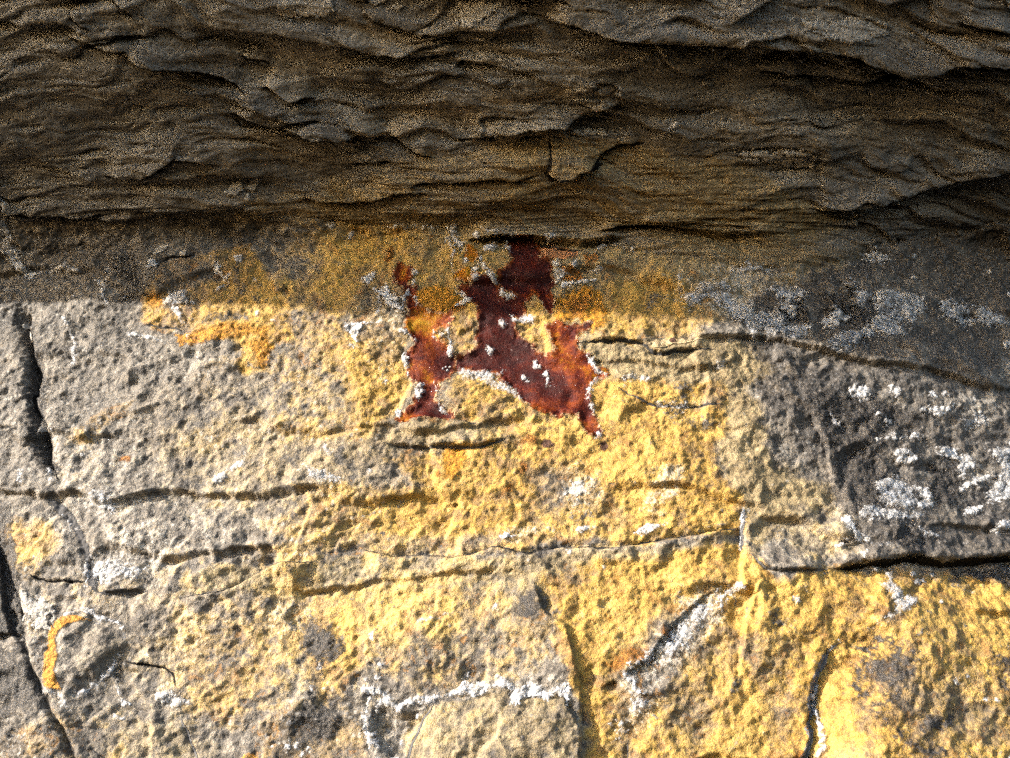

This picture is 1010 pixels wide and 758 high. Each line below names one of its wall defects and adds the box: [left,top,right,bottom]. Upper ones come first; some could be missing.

crack [520,0,1010,84]
crack [66,18,433,159]
crack [298,141,645,204]
leakage [863,246,892,263]
corrosion [384,234,609,451]
leakage [684,261,927,350]
leakage [939,297,1005,328]
leakage [795,377,1010,558]
crack [0,333,145,758]
crack [365,509,1010,572]
leakage [873,567,918,616]
leakage [954,563,1010,587]